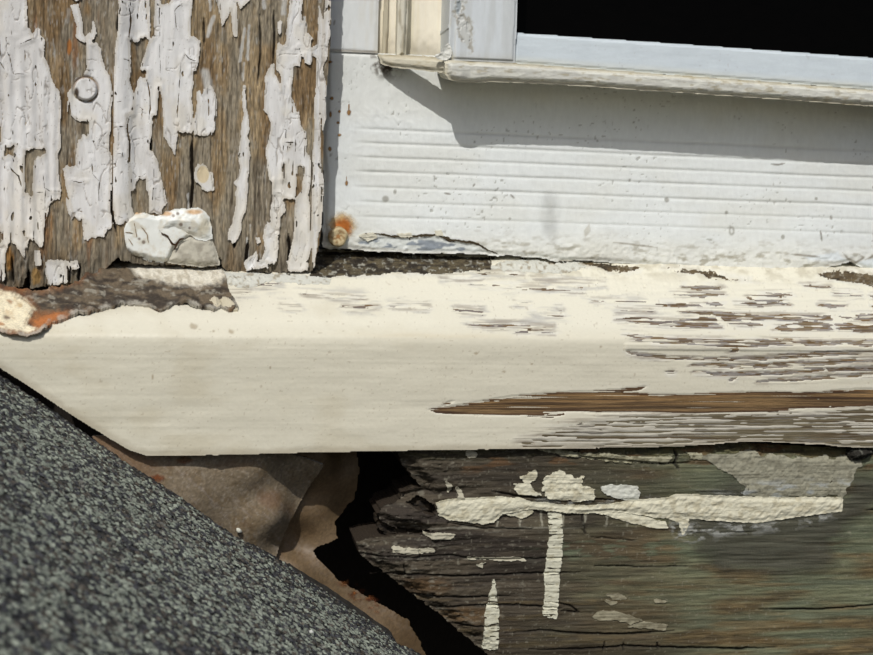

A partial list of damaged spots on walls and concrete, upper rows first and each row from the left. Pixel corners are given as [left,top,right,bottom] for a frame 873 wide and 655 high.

peeling [216,0,250,37]
peeling [0,0,217,285]
peeling [244,0,501,286]
peeling [228,85,251,244]
rust [329,214,354,235]
peeling [548,261,640,273]
peeling [431,265,873,502]
peeling [391,531,456,555]
peeling [467,556,526,568]
peeling [593,593,668,631]